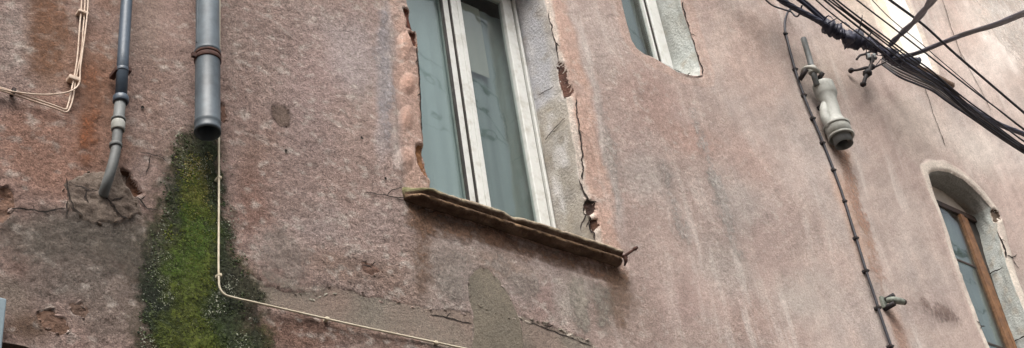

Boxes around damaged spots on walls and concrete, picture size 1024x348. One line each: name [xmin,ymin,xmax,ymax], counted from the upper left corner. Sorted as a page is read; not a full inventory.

spalling [403,8,416,46]
crack [548,13,559,59]
spalling [556,62,574,98]
spalling [415,145,428,178]
crack [545,99,598,240]
crack [990,232,1018,274]
peeling [249,273,596,348]